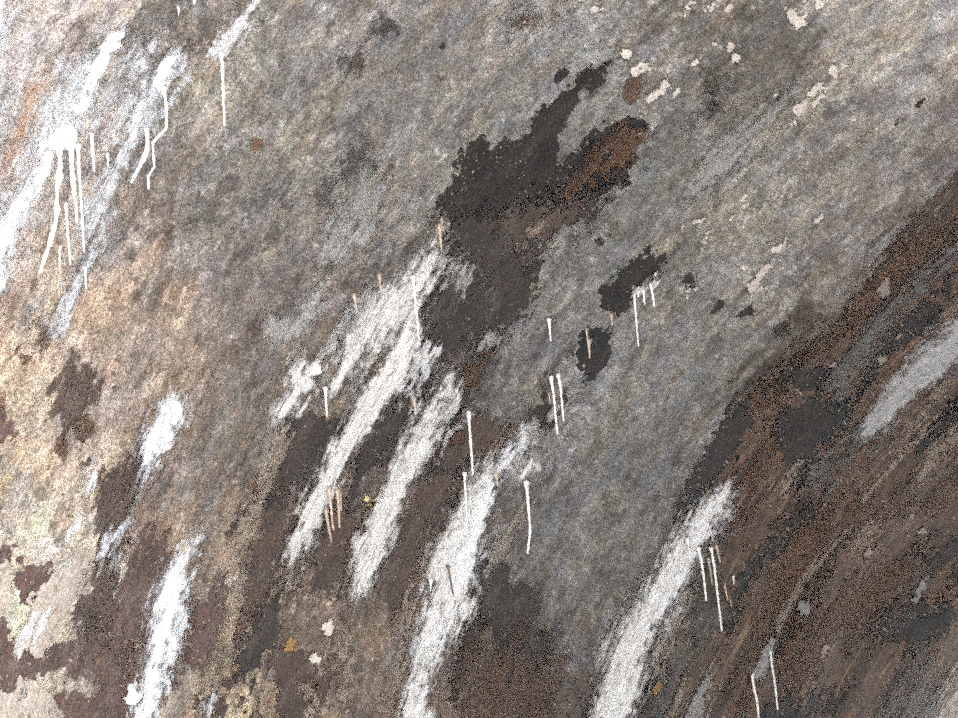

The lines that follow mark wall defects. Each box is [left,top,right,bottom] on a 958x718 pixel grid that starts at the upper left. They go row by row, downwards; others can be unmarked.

damp [0,0,19,56]
damp [366,15,401,36]
damp [704,73,719,120]
damp [692,88,799,197]
damp [0,22,649,718]
damp [568,173,958,718]